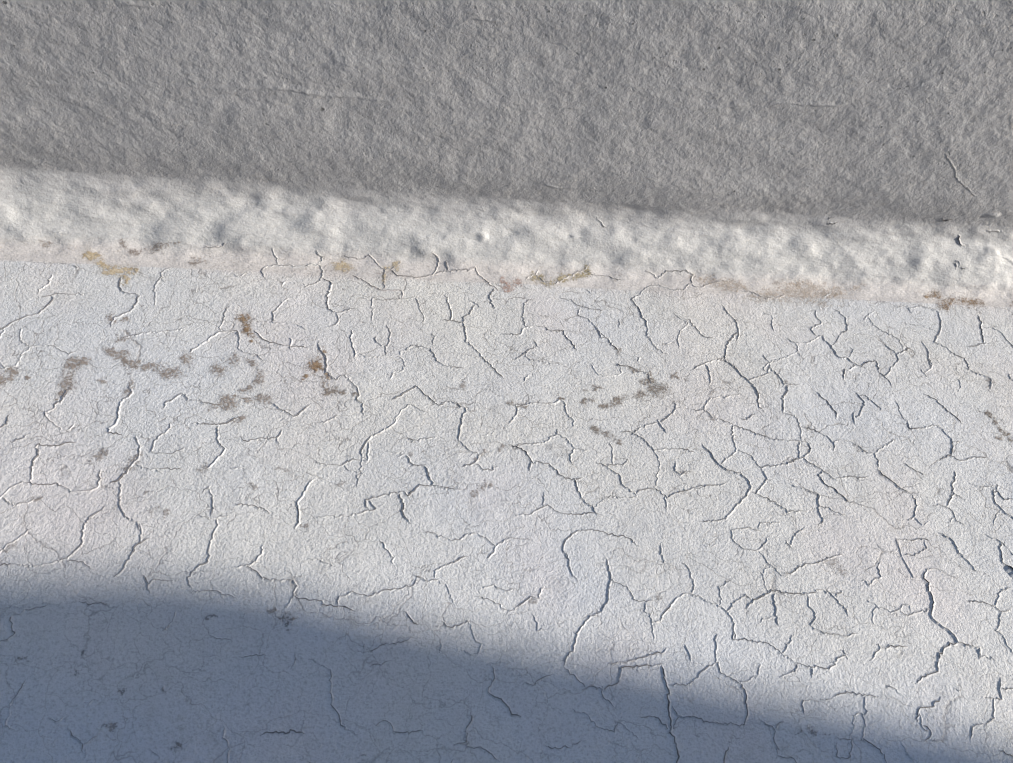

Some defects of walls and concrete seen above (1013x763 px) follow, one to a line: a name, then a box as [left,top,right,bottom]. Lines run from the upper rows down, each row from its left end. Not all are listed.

crack [0,248,1013,763]